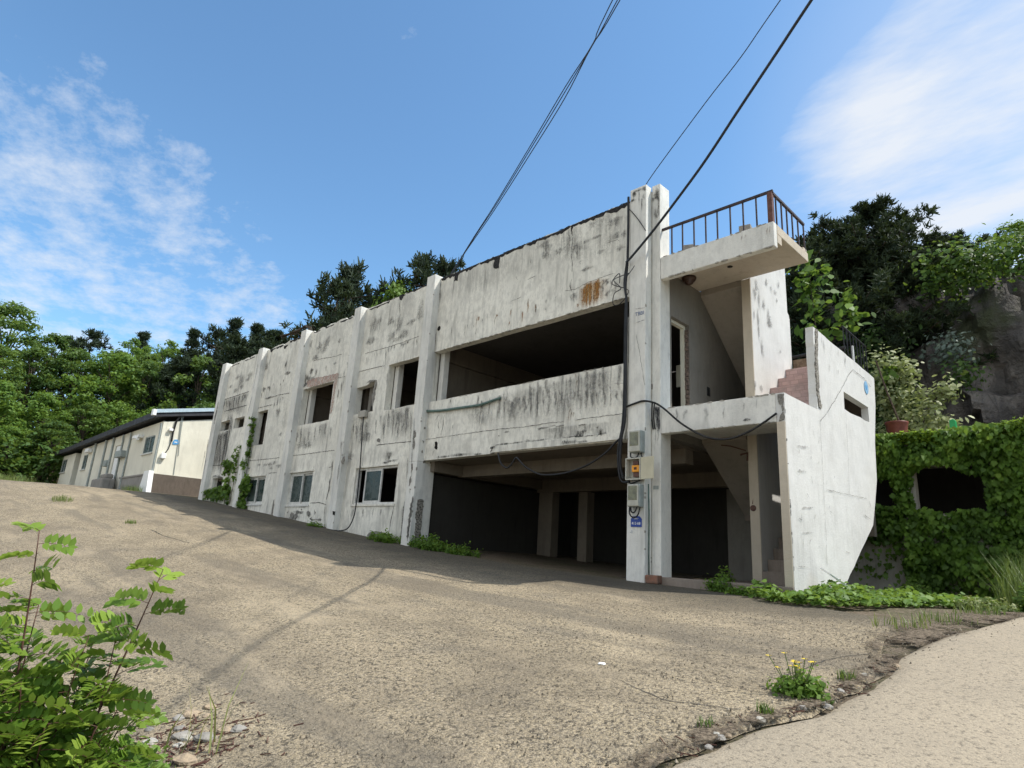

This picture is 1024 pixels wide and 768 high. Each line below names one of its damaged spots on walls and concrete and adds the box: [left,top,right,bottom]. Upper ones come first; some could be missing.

rust [577,279,600,306]
leakage [477,365,621,417]